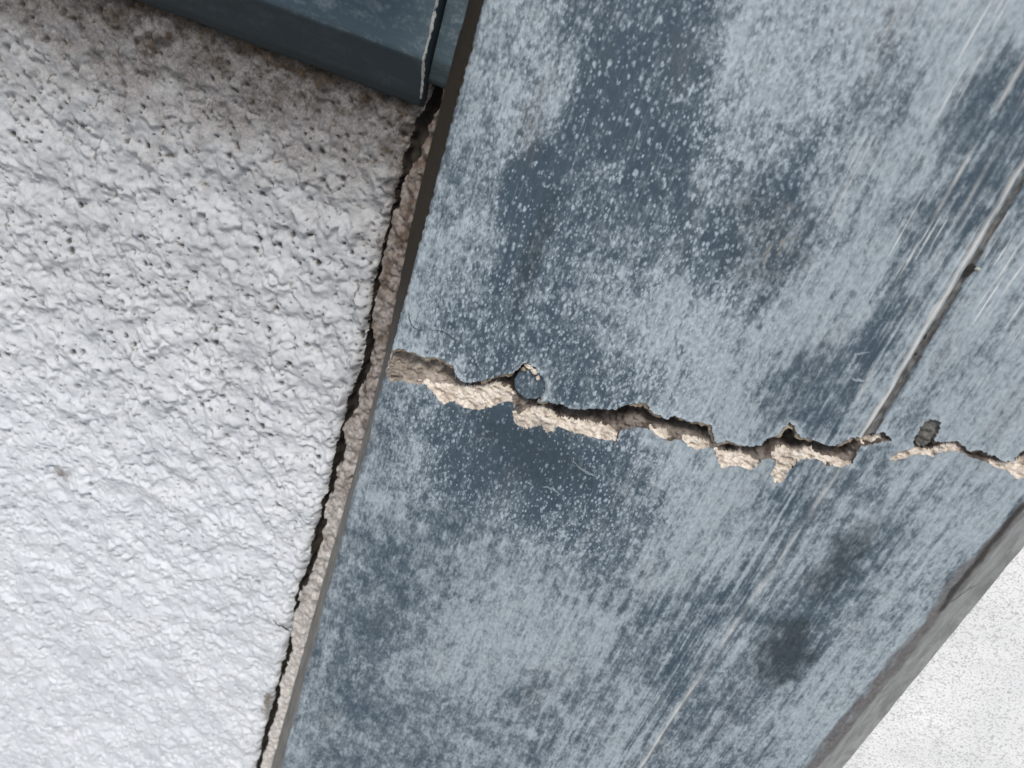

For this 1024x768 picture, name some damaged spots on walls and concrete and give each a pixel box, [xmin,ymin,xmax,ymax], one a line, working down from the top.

crack [256,85,1024,768]